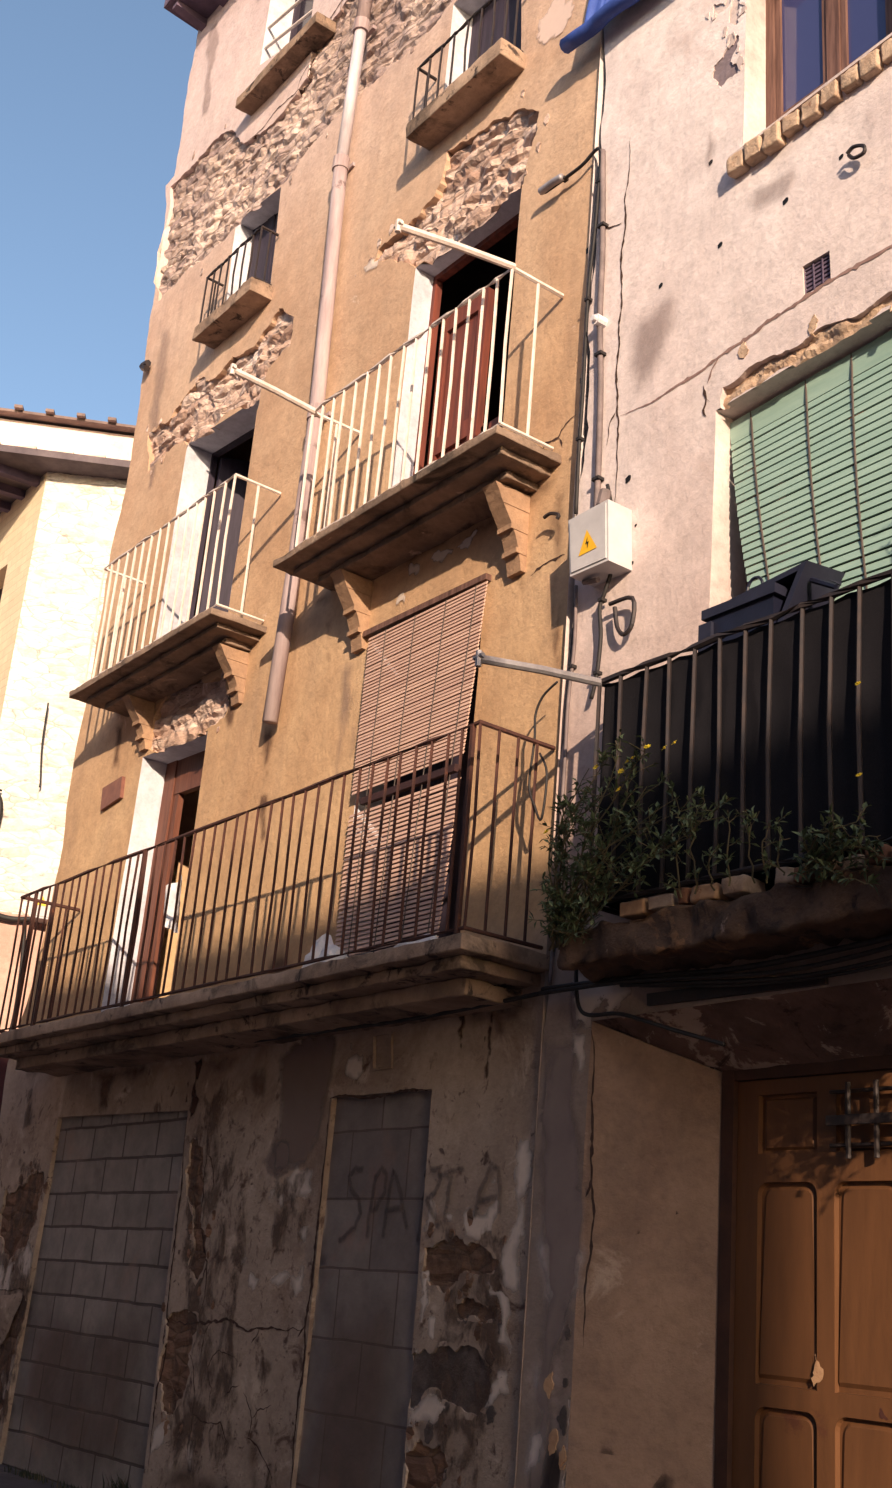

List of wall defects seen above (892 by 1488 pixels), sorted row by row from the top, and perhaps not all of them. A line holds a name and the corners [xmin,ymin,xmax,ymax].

peeling [706,0,747,88]
flaking render [154,0,454,301]
flaking render [367,89,550,267]
flaking render [146,308,294,475]
crack [543,416,574,449]
peeling [737,341,749,359]
crack [607,141,892,497]
peeling [0,1161,48,1269]
peeling [157,1138,216,1436]
crack [147,1088,428,1488]
peeling [404,1179,510,1488]